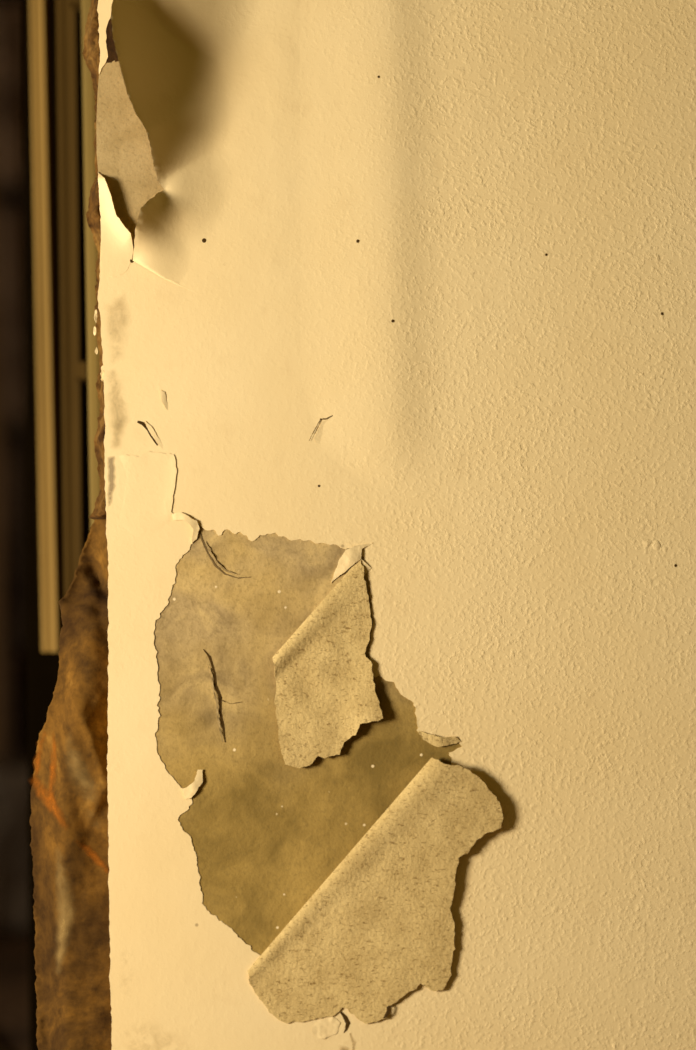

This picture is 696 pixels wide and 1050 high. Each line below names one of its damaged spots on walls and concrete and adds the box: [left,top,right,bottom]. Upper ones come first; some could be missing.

peeling [29,0,299,1050]
crack [203,649,240,742]
peeling [154,512,503,1024]